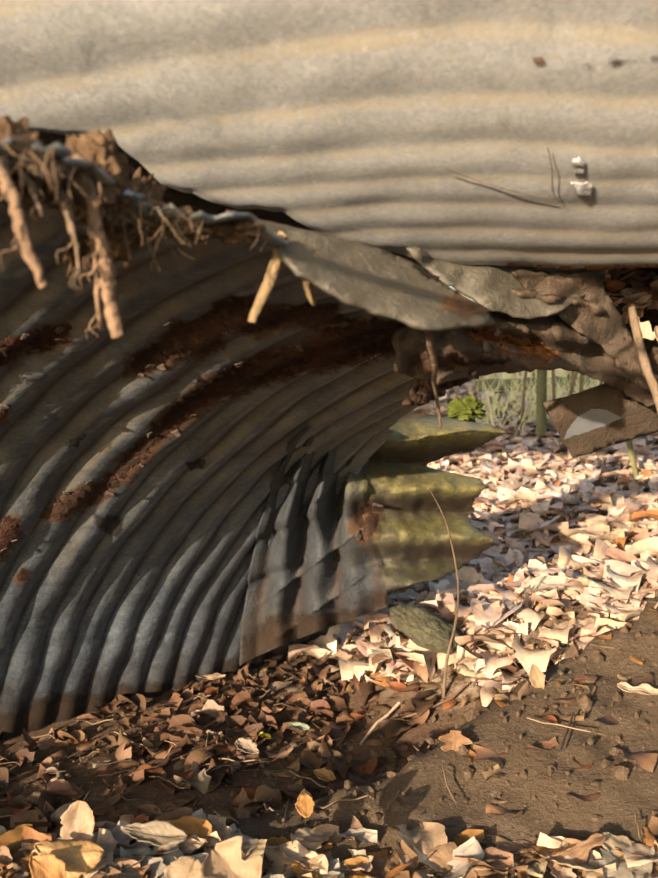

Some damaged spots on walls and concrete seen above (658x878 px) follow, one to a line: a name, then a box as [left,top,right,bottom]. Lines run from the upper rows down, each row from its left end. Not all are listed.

rust [441,294,486,316]
rust [0,323,72,367]
rust [401,326,560,406]
rust [40,296,403,523]
rust [0,515,23,562]